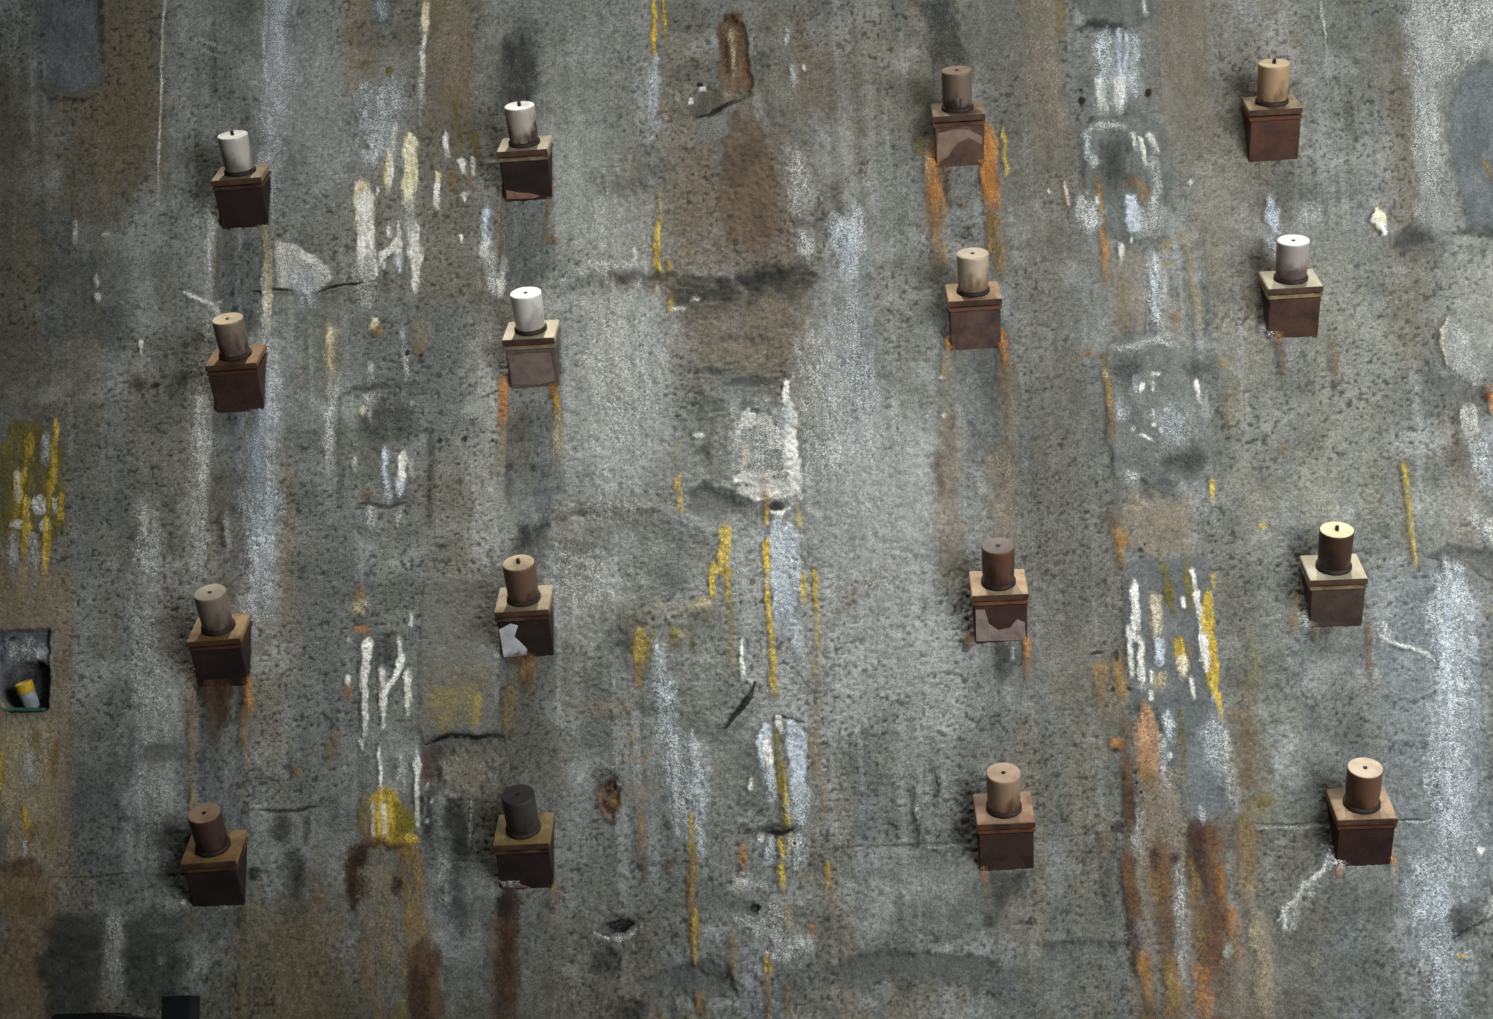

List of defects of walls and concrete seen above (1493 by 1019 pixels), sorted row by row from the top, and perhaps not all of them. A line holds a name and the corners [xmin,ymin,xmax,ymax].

spalling [689,12,754,119]
water stain [322,0,496,527]
water stain [479,207,508,296]
spalling [606,229,816,311]
rust [925,121,1005,273]
water stain [1048,0,1209,331]
water stain [1401,463,1417,560]
crack [725,675,809,729]
water stain [1092,492,1272,889]
spalling [593,767,622,825]
rust [1100,700,1255,1019]
water stain [1250,864,1326,1019]